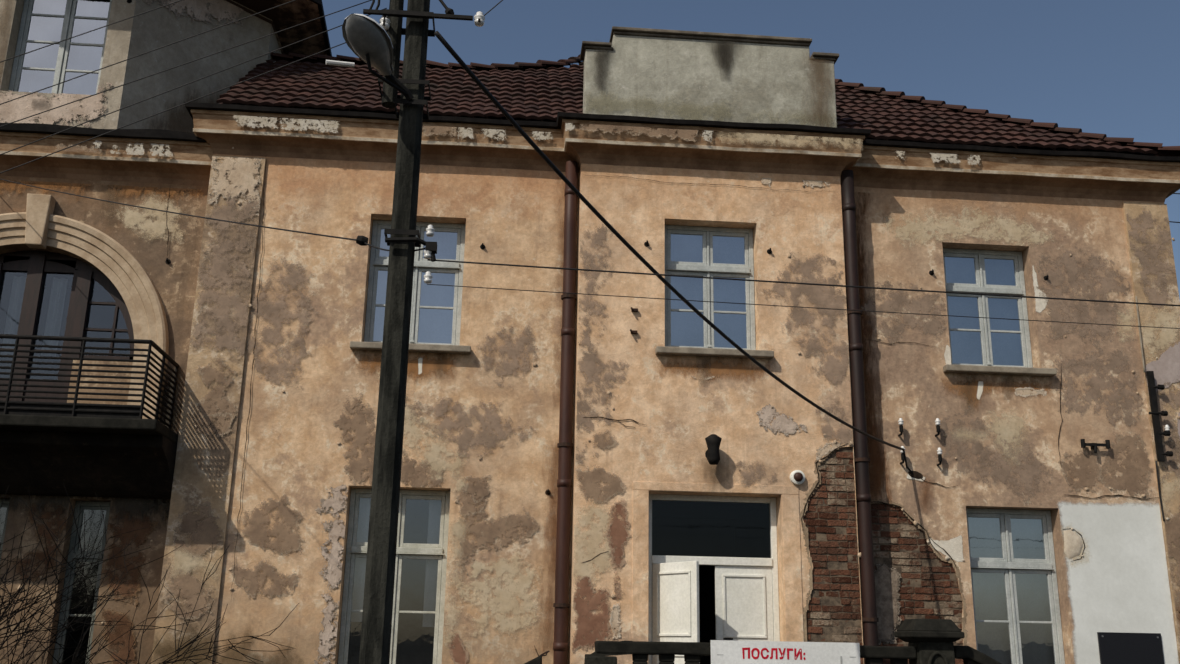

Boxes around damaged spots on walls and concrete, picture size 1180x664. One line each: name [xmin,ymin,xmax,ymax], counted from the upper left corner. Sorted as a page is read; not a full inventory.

flaking render [0,81,119,128]
peeling [54,141,173,157]
peeling [232,115,339,133]
peeling [422,125,506,140]
peeling [930,153,981,165]
flaking render [762,253,849,384]
flaking render [401,448,445,487]
flaking render [939,208,1180,619]
crack [1058,370,1159,500]
flaking render [159,392,376,664]
flaking render [454,475,539,575]
flaking render [800,401,968,664]